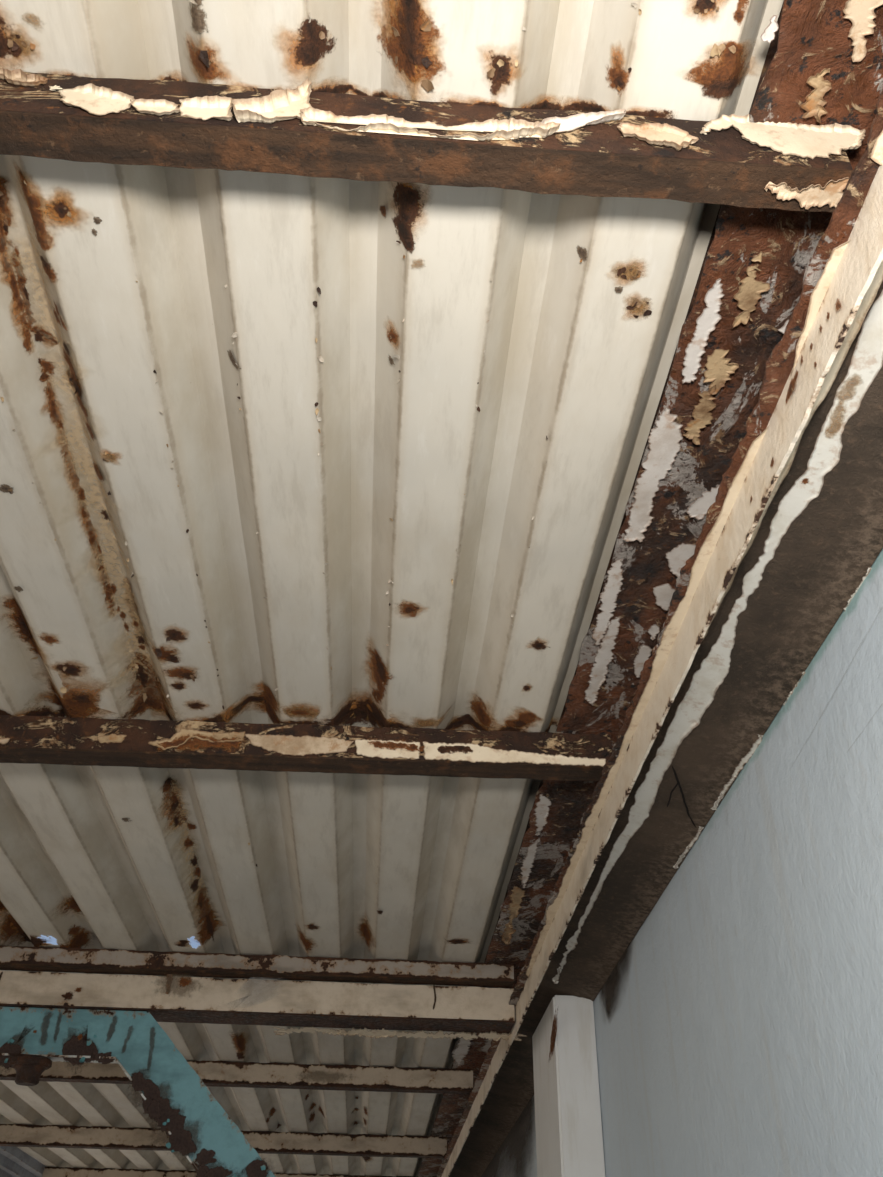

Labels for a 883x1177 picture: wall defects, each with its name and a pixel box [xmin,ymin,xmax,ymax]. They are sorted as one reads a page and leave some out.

corrosion [286,19,337,73]
corrosion [377,0,443,92]
peeling [0,68,883,165]
corrosion [443,52,517,107]
peeling [843,0,883,62]
corrosion [379,182,425,268]
peeling [764,177,849,209]
corrosion [0,170,197,721]
peeling [552,239,883,984]
corrosion [158,648,556,754]
peeling [148,425,770,977]
leakage [600,942,631,1018]